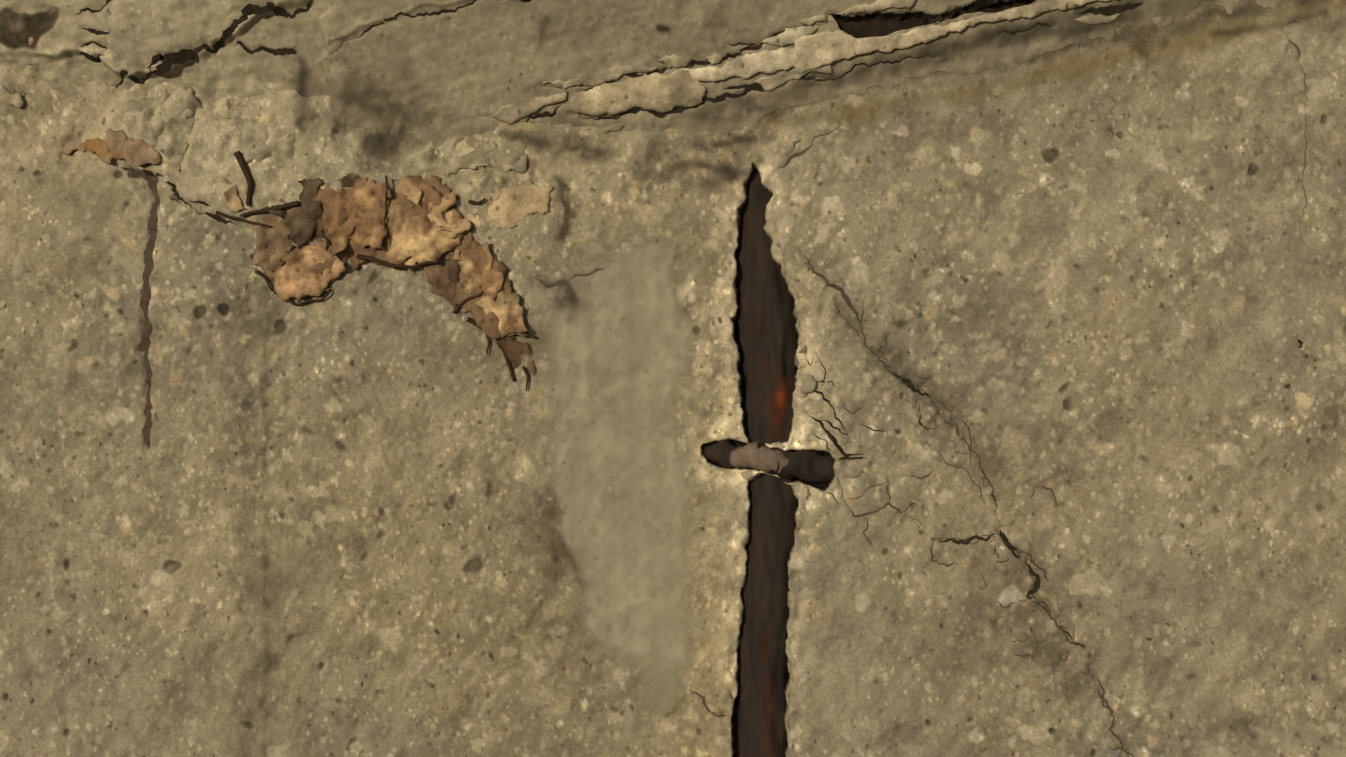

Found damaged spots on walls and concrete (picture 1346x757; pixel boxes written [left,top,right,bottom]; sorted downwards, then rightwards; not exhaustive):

crack [76,0,312,88]
crack [333,0,477,53]
crack [121,167,236,449]
spalling [701,167,773,603]
spalling [780,265,817,394]
spalling [772,439,833,459]
spalling [781,478,834,523]
crack [795,245,1134,757]
spalling [722,628,741,756]